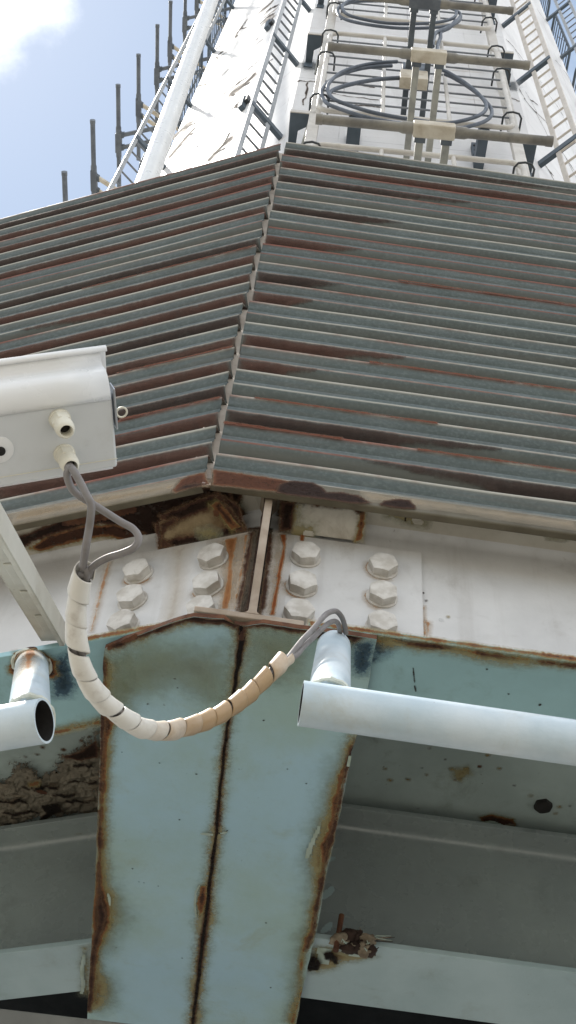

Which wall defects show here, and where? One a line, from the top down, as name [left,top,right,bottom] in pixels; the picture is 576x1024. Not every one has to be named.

rust [0,149,576,279]
rust [0,235,576,472]
rust [8,647,58,678]
rust [19,469,576,691]
rust [0,715,117,1012]
rust [287,736,365,1024]